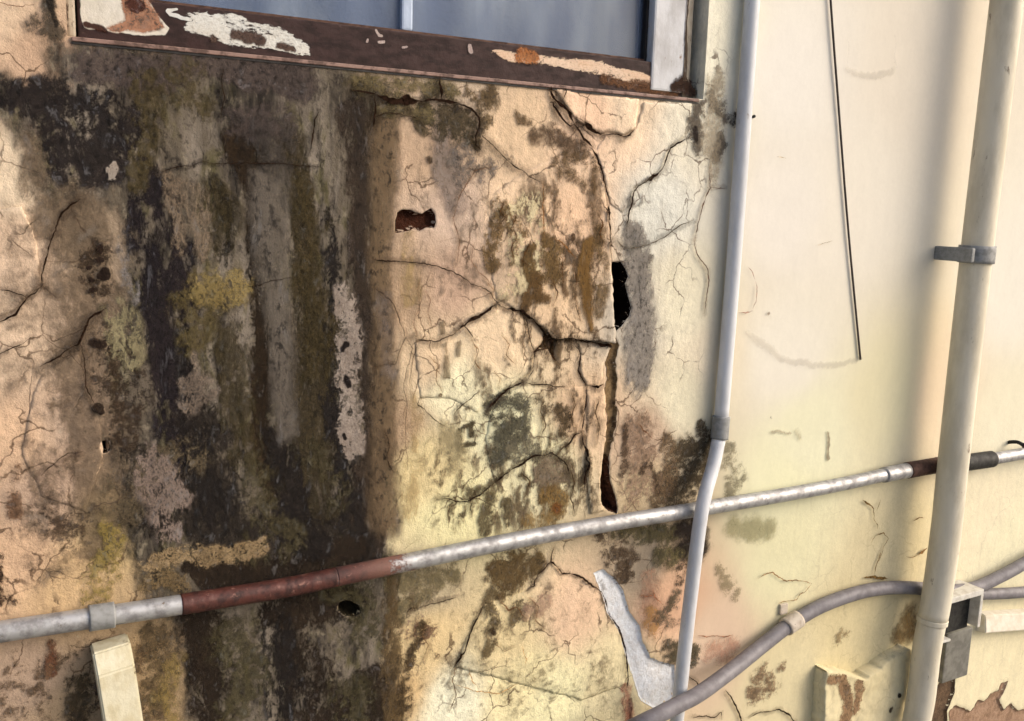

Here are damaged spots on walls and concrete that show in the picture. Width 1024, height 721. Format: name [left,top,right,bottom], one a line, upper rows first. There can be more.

peeling [80,0,310,56]
water stain [0,0,501,607]
flaking render [395,209,436,233]
crack [351,79,618,513]
crack [550,86,724,314]
water stain [622,194,656,395]
flaking render [485,262,631,514]
water stain [134,563,461,721]
crack [451,549,629,707]
water stain [594,518,693,665]
crack [694,690,794,721]
flaking render [932,679,1024,721]